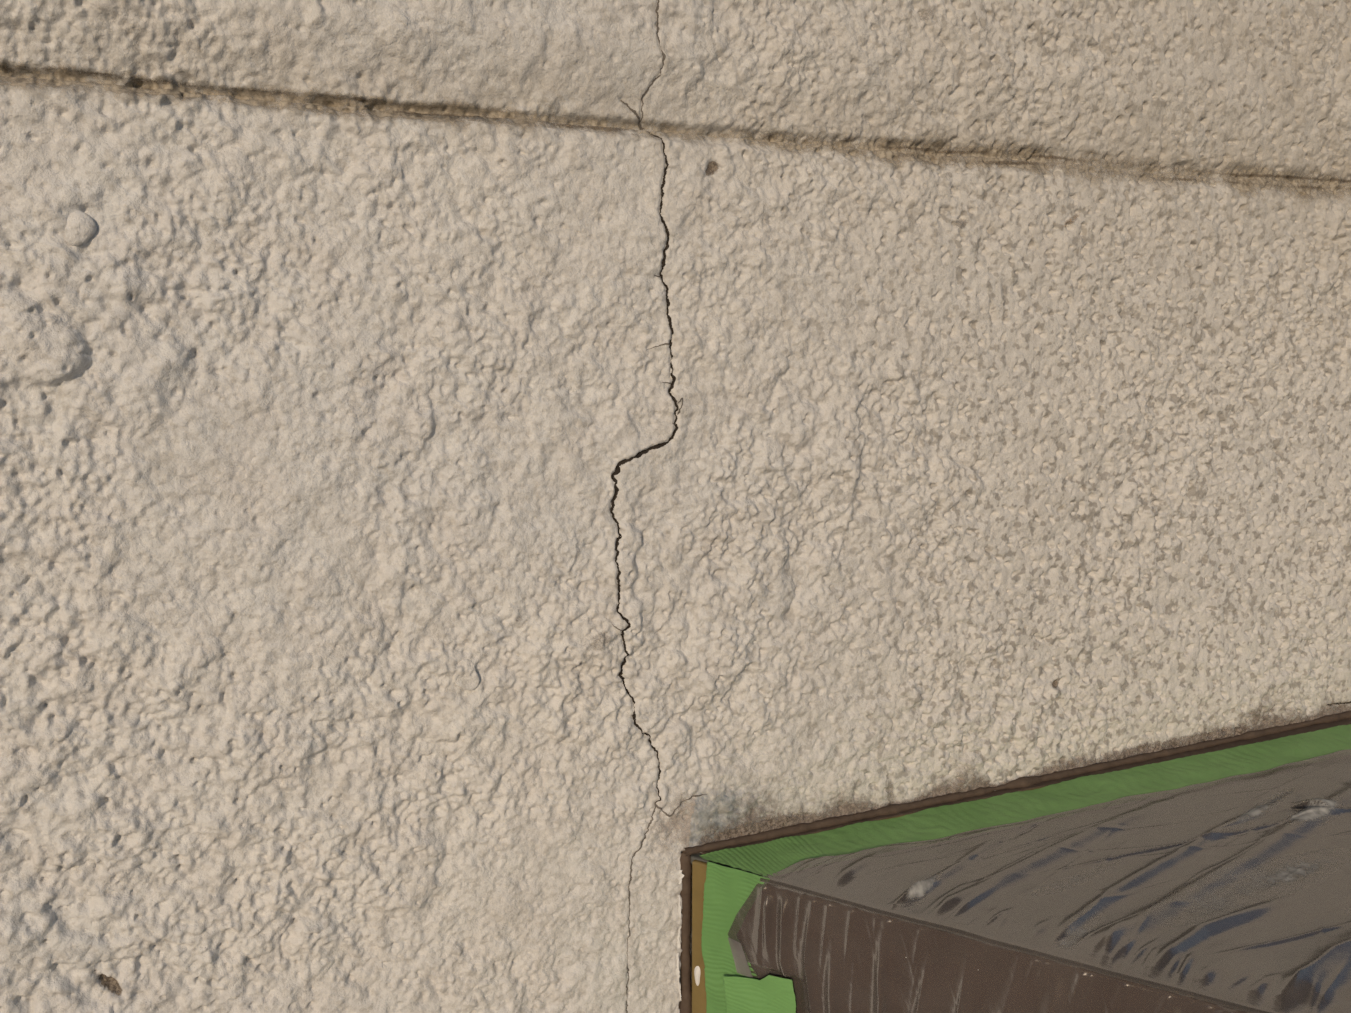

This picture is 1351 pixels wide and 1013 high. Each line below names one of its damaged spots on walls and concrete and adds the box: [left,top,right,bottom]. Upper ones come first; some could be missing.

crack [610,0,707,1013]